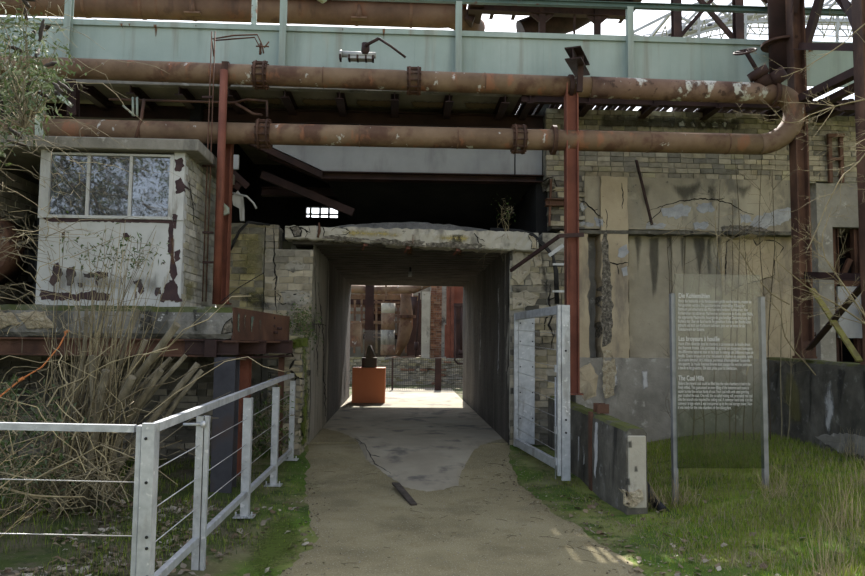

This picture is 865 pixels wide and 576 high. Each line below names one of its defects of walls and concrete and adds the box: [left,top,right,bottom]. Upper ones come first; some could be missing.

peeling [174,158,190,194]
spalling [541,175,564,233]
crack [647,198,754,223]
peeling [39,214,183,303]
water stain [636,237,669,287]
water stain [694,238,710,269]
spalling [579,176,629,399]